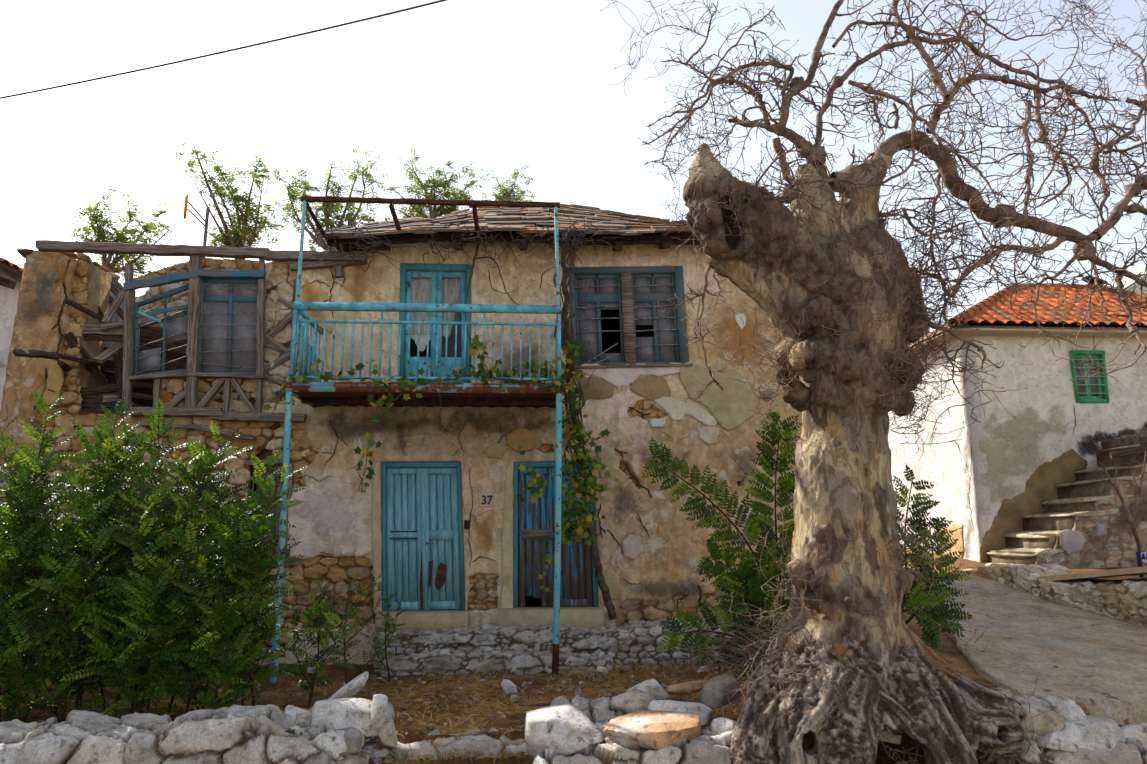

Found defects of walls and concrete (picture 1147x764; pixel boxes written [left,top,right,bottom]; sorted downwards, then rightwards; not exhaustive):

spalling [36,252,108,449]
spalling [627,399,668,422]
crack [614,448,653,539]
leakage [964,408,1065,502]
crack [597,503,641,585]
spalling [280,552,381,633]
spalling [467,573,499,611]